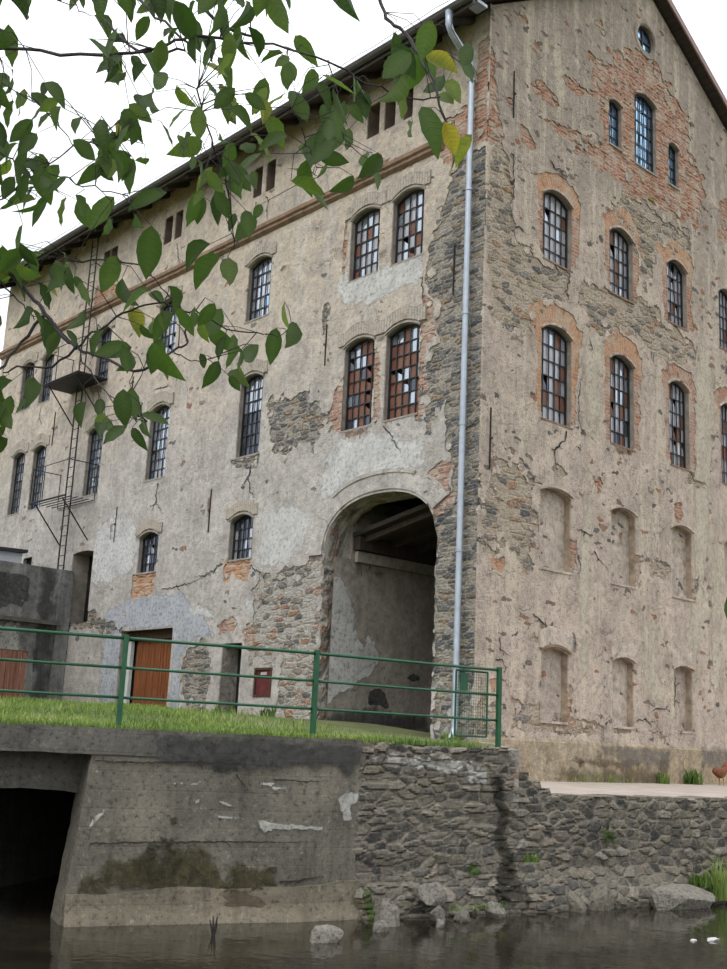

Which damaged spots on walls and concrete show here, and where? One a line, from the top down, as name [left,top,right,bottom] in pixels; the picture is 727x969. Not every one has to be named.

flaking render [231,37,727,742]
crack [162,563,222,592]
flaking render [69,504,379,719]
leakage [0,621,20,650]
leakage [32,570,55,699]
leakage [157,735,361,776]
leakage [258,820,323,832]
leakage [338,792,358,821]
leakage [372,752,531,905]
leakage [224,891,268,908]